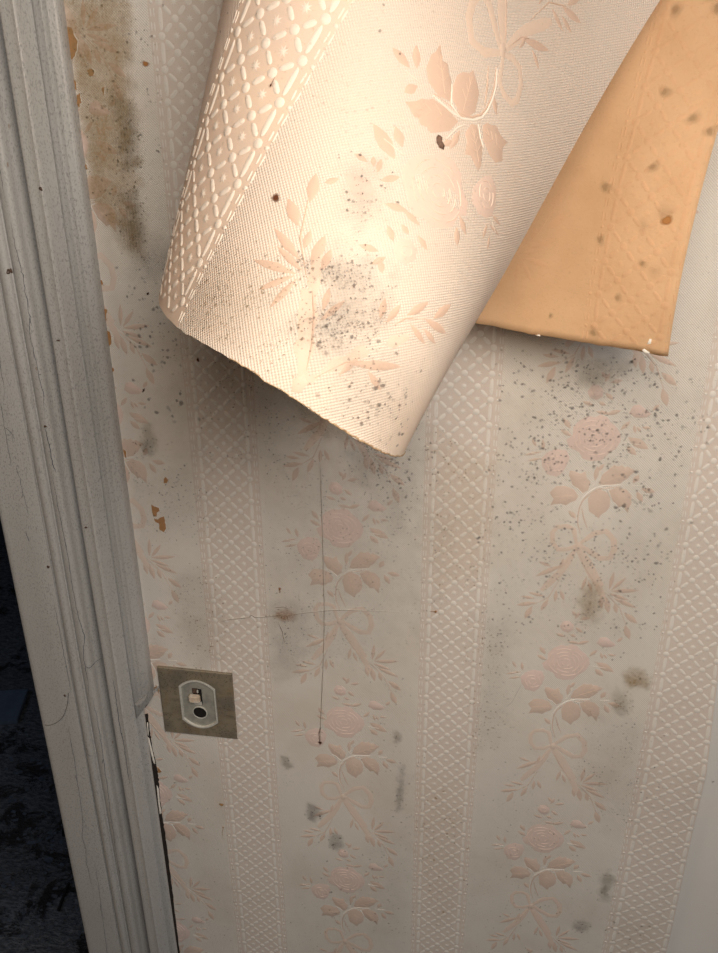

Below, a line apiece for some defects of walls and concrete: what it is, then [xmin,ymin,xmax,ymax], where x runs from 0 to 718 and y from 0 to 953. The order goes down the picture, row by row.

peeling [159,0,718,457]
peeling [151,505,167,533]